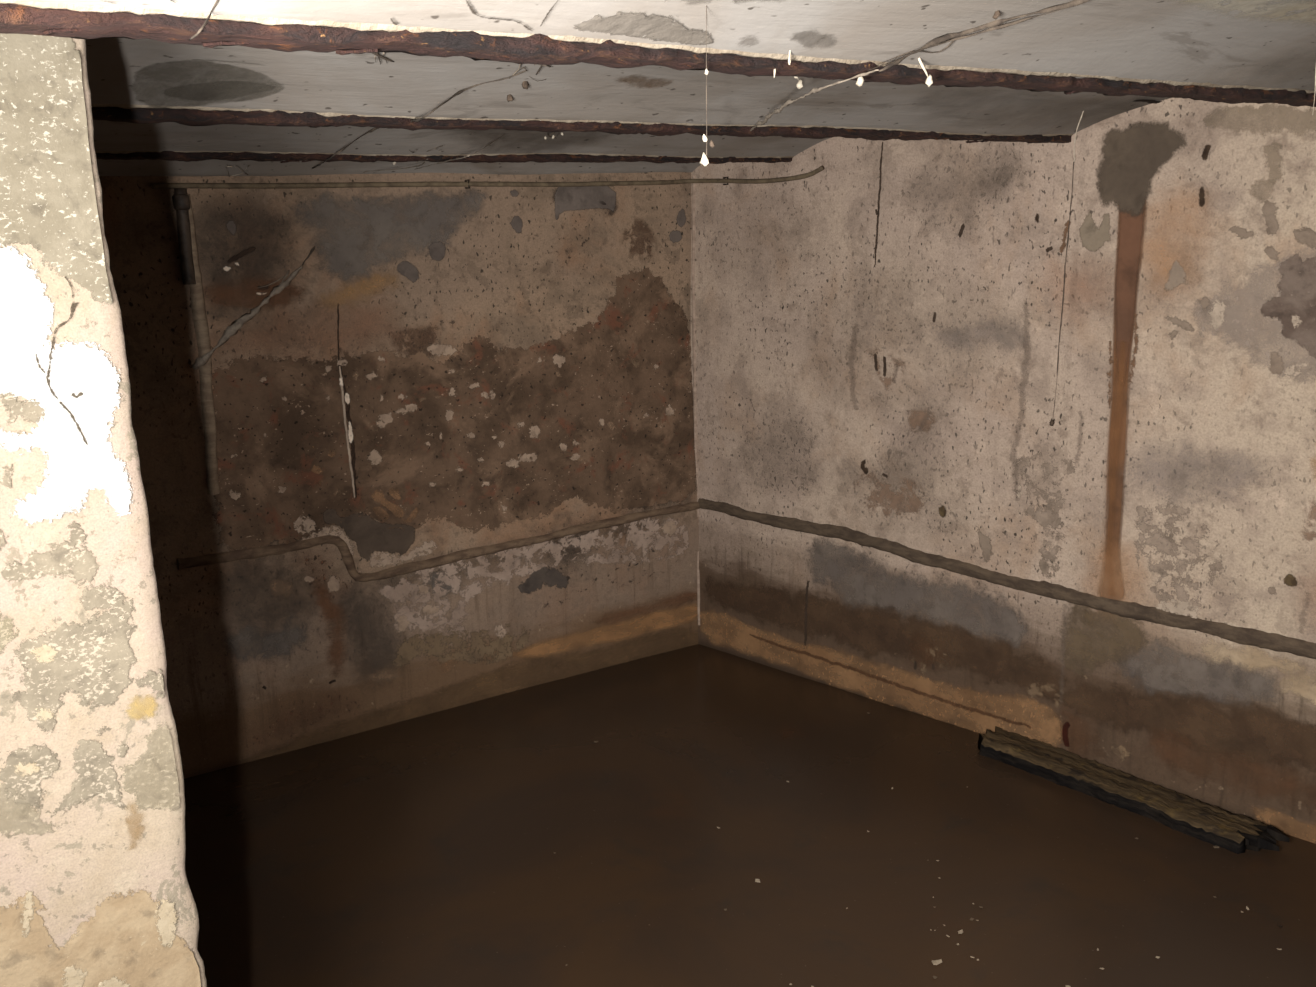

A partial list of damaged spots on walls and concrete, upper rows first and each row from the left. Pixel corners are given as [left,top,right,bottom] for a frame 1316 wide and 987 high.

crack [466,1,557,31]
leakage [792,32,833,47]
leakage [134,59,280,108]
rust [1060,220,1070,253]
spalling [1164,143,1316,383]
crack [35,277,88,445]
rust [1096,122,1186,600]
peeling [0,390,46,423]
peeling [0,464,13,489]
rust [1304,504,1316,541]
peeling [0,510,180,838]
leakage [252,538,1316,854]